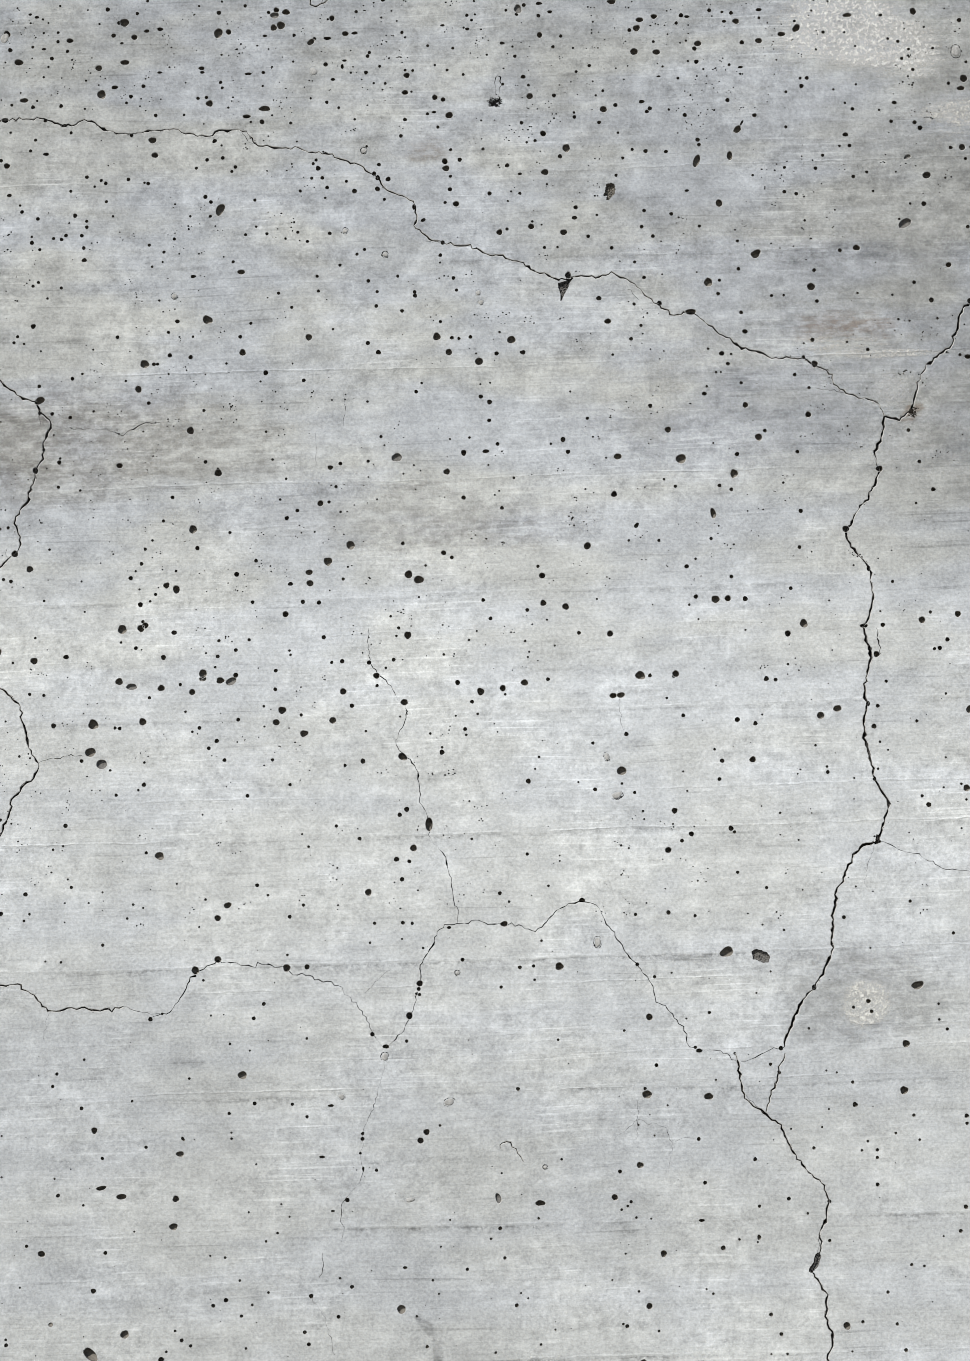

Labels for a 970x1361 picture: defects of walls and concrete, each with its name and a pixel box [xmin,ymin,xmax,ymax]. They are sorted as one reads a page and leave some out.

crack [309,0,328,8]
crack [0,117,970,1051]
crack [499,1141,524,1162]
crack [715,1047,835,1361]